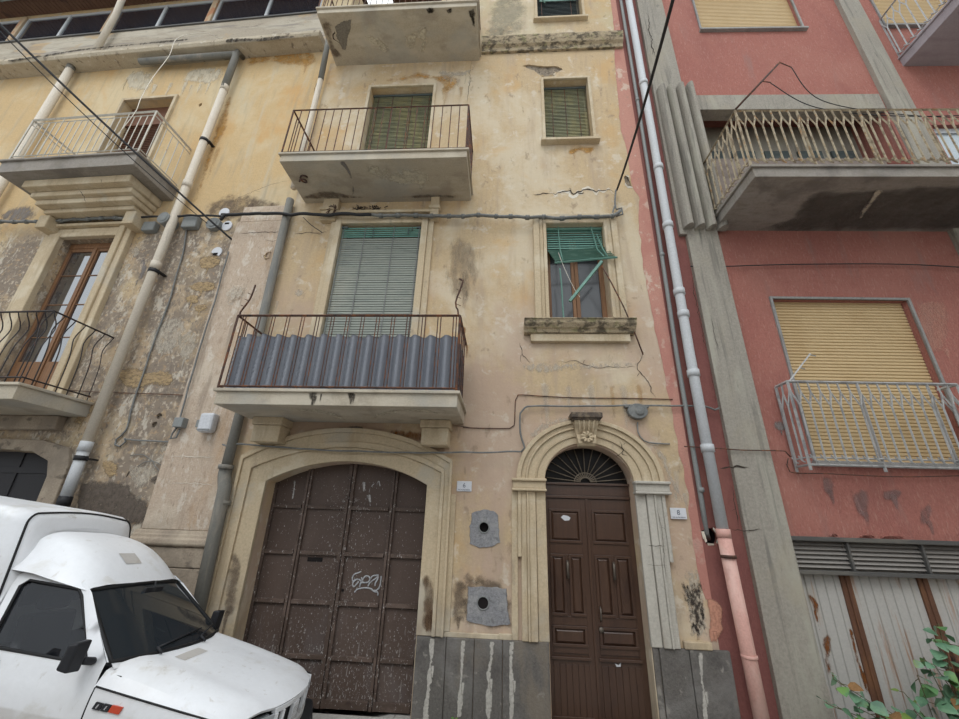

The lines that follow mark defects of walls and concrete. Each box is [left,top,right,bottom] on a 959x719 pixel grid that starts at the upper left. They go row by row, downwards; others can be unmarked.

spalling [332,20,351,50]
spalling [523,65,562,77]
crack [534,186,614,199]
water stain [454,579,500,628]